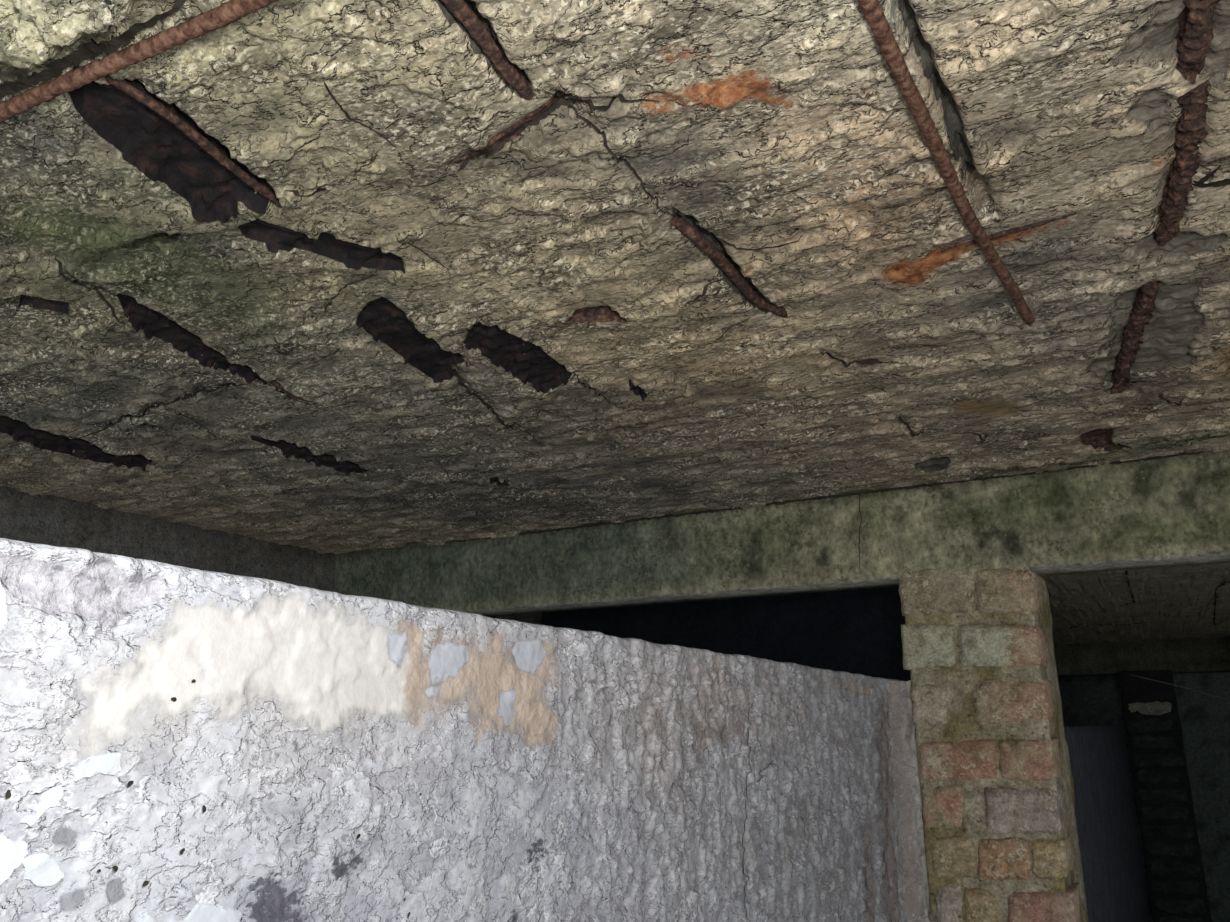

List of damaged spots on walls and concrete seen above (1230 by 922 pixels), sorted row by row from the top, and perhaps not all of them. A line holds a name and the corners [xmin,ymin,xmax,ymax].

spalling [435,0,572,167]
corrosion [643,70,792,113]
spalling [0,0,405,274]
spalling [670,208,788,318]
corrosion [882,220,1067,288]
spalling [356,297,572,394]
spalling [0,415,152,472]
spalling [249,435,367,474]
peeling [0,552,469,826]
peeling [497,688,516,726]
peeling [512,638,546,674]
peeling [0,835,64,887]